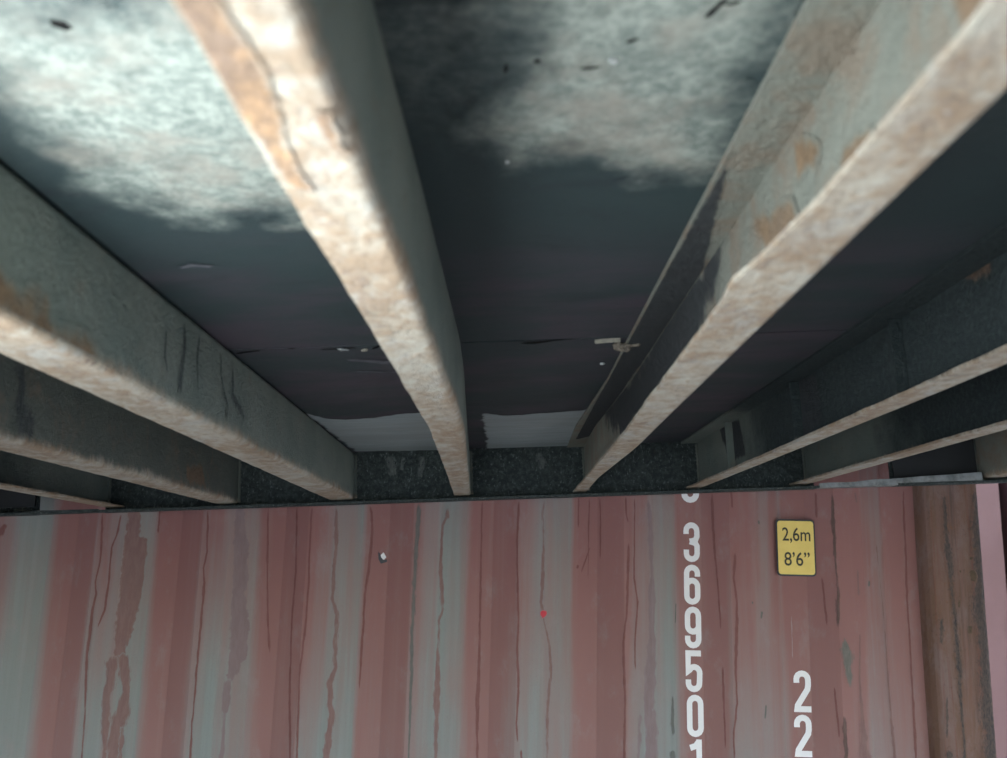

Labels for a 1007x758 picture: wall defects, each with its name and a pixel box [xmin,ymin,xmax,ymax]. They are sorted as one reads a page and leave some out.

corrosion [947,0,984,33]
water stain [0,0,310,235]
corrosion [174,0,314,193]
corrosion [311,110,348,155]
water stain [445,0,801,192]
corrosion [792,131,821,185]
corrosion [838,124,873,170]
corrosion [752,196,798,250]
corrosion [0,261,99,358]